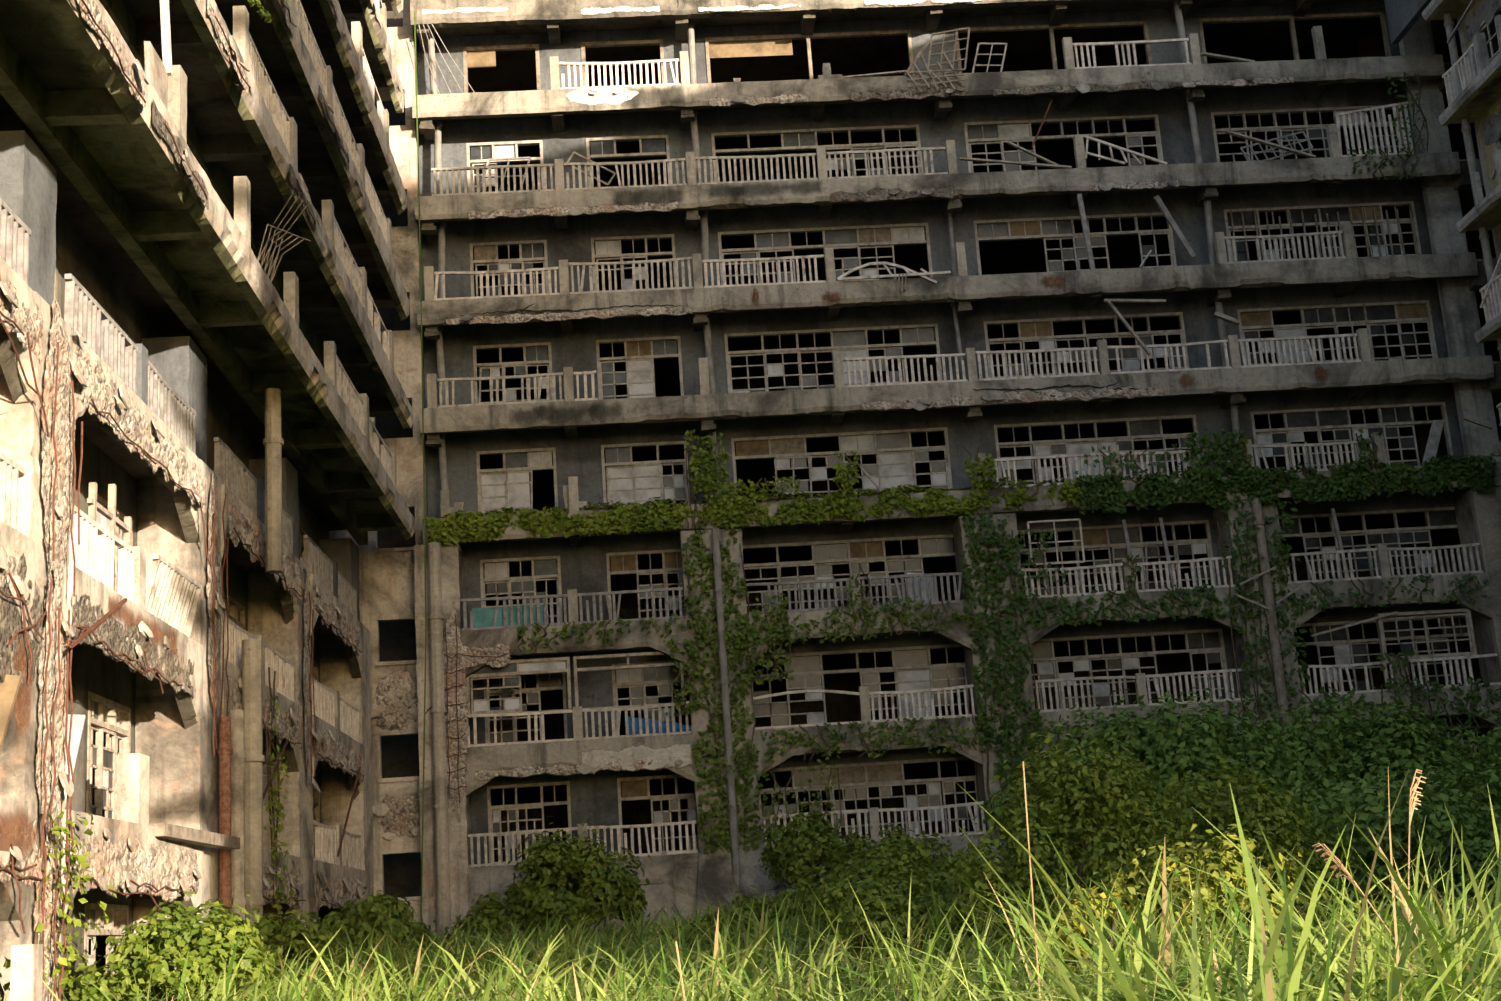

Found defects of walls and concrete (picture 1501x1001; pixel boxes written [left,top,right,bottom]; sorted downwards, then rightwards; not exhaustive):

spalling [289,164,320,230]
spalling [0,272,365,1001]
spalling [443,602,692,822]